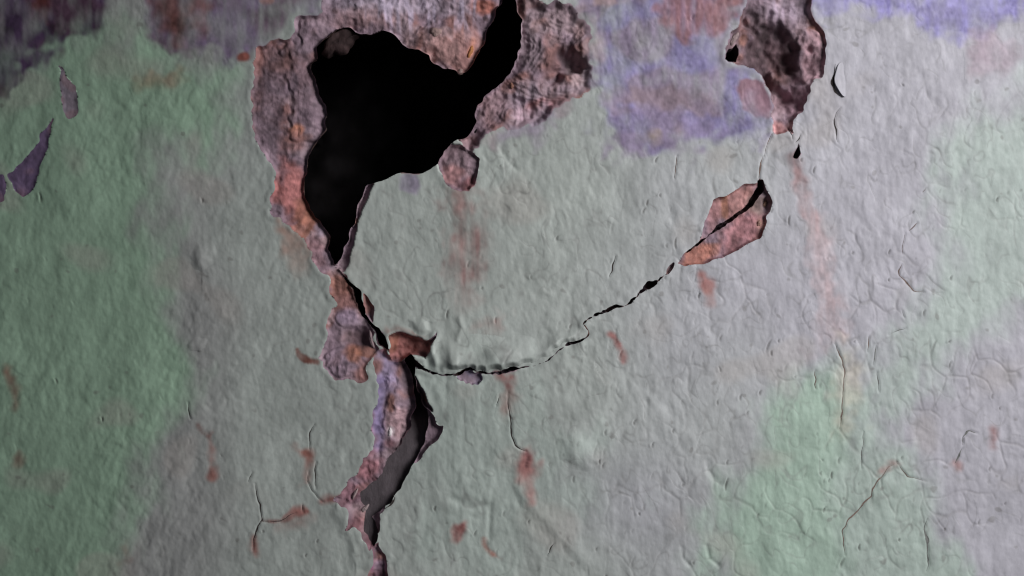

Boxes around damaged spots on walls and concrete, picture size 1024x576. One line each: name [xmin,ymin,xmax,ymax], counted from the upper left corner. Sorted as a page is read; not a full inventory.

peeling [0,0,114,202]
peeling [438,0,1024,191]
spalling [135,0,502,576]
crack [416,274,667,451]
spalling [666,178,773,274]
crack [249,465,317,545]
corrosion [245,439,342,560]
corrosion [511,441,546,510]